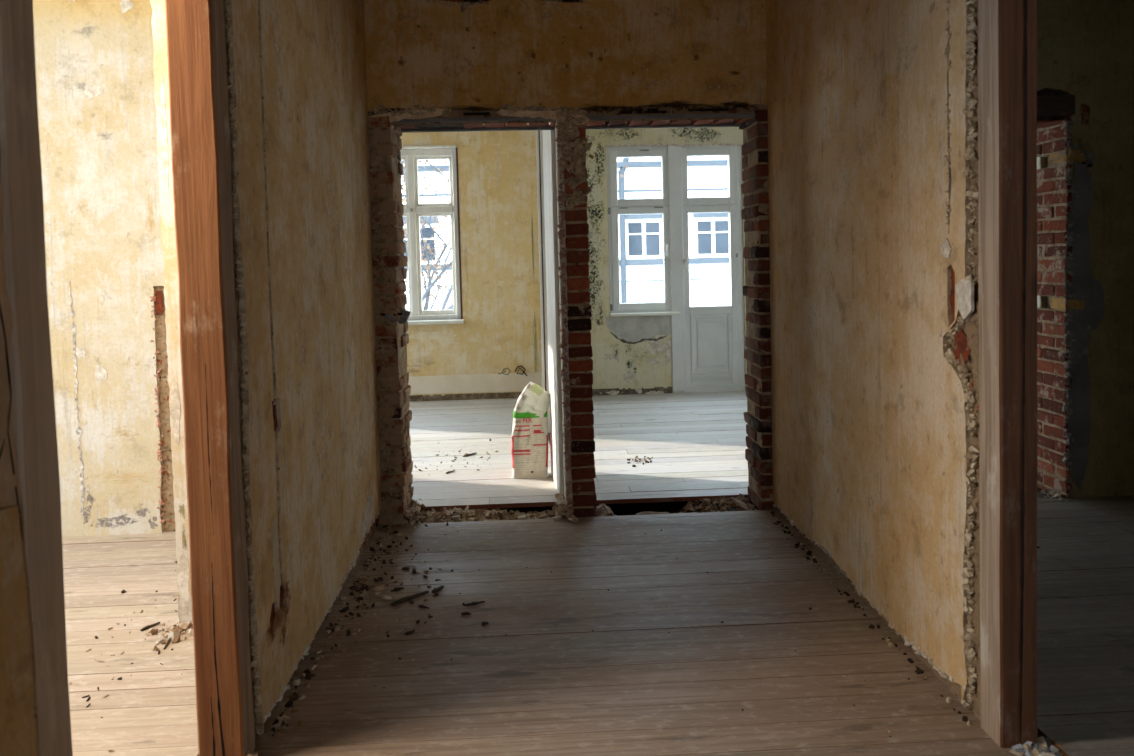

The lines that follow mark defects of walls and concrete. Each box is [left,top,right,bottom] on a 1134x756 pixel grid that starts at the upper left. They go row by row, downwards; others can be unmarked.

flaking render [0,147,26,573]
water stain [586,129,637,324]
peeling [605,315,672,365]
flaking render [773,0,981,721]